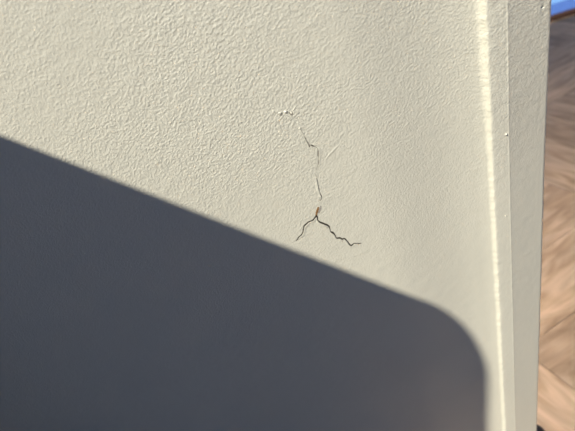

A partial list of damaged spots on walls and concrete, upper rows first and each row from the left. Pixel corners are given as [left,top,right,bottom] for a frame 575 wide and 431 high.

crack [296,127,361,248]